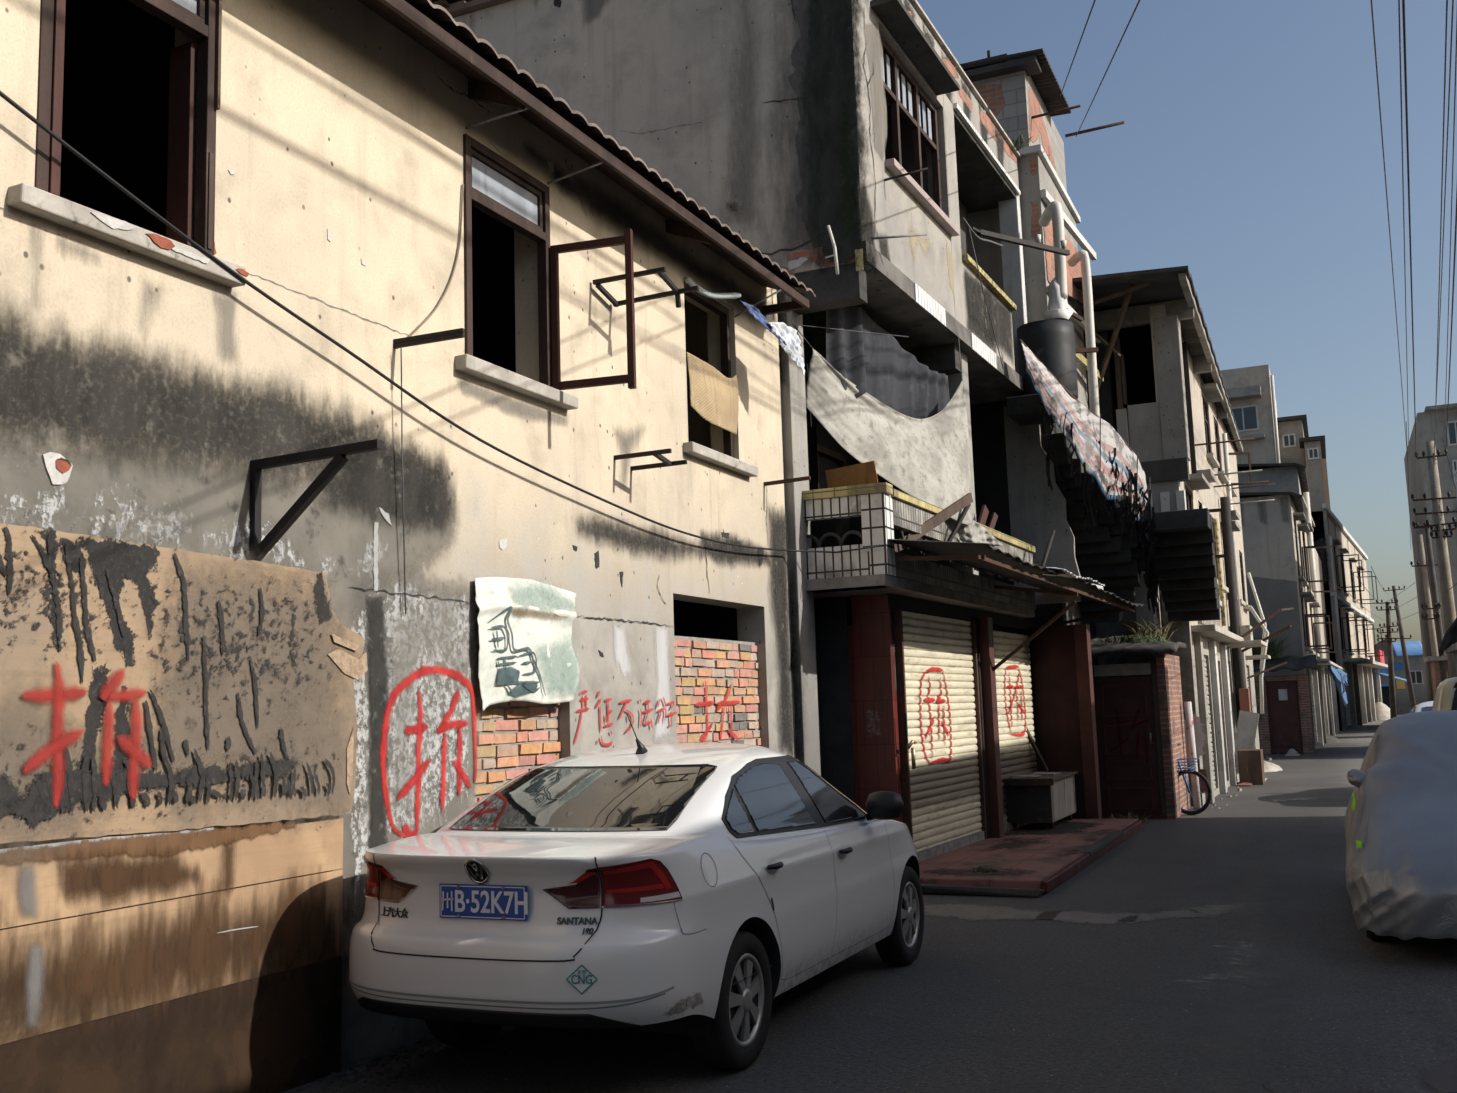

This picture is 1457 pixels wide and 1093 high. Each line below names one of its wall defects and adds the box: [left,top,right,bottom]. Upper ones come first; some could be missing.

leakage [803,0,876,270]
leakage [219,297,234,357]
crack [250,274,409,336]
spalling [1,452,73,529]
peeling [90,485,334,575]
leakage [0,441,479,1093]